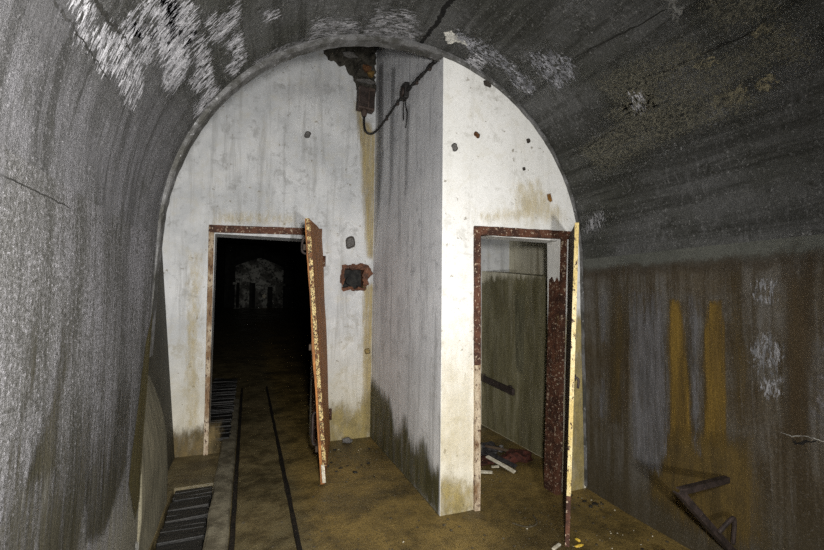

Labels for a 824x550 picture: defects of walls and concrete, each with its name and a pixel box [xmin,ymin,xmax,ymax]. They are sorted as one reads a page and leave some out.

leakage [443,31,468,45]
leakage [8,315,153,550]
crack [781,432,824,445]